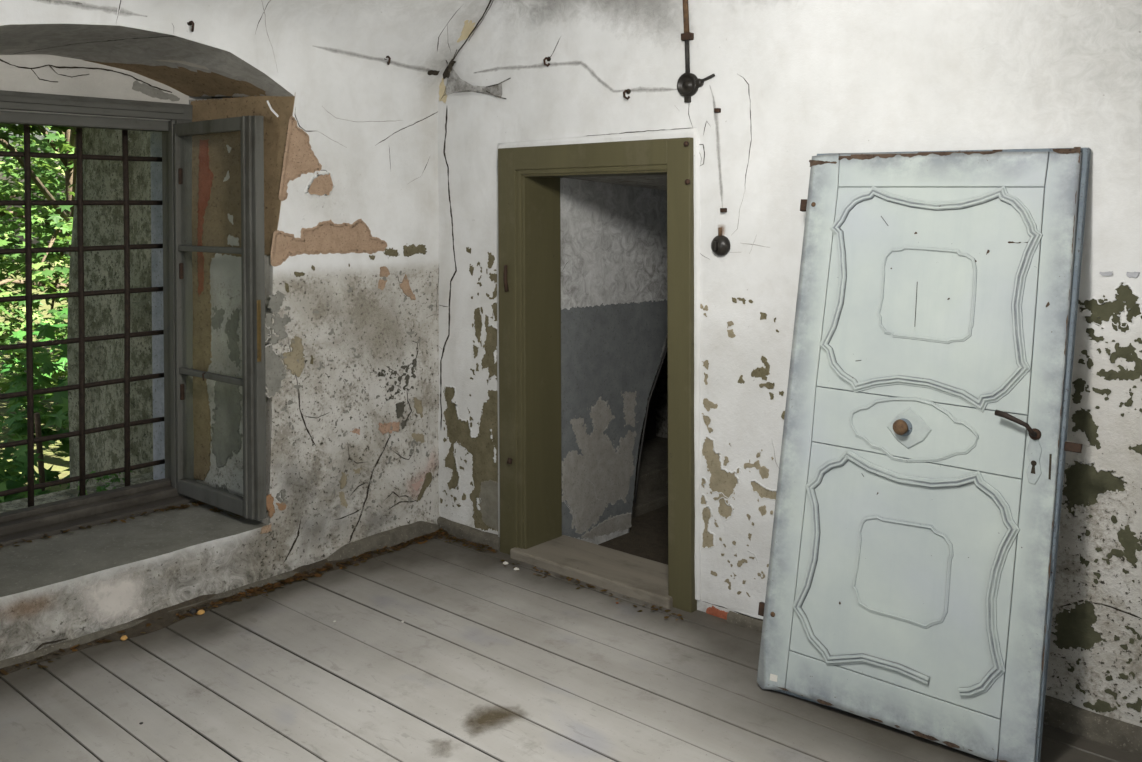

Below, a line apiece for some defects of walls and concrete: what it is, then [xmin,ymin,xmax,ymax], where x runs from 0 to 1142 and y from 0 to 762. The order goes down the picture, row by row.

crack [0,0,175,93]
crack [254,0,279,73]
spalling [427,59,456,104]
spalling [84,60,431,516]
crack [282,517,302,563]
crack [267,100,458,544]
peeling [408,247,498,532]
peeling [700,360,777,597]
peeling [732,297,779,333]
peeling [738,356,784,400]
peeling [1061,271,1142,584]
peeling [1051,598,1142,723]